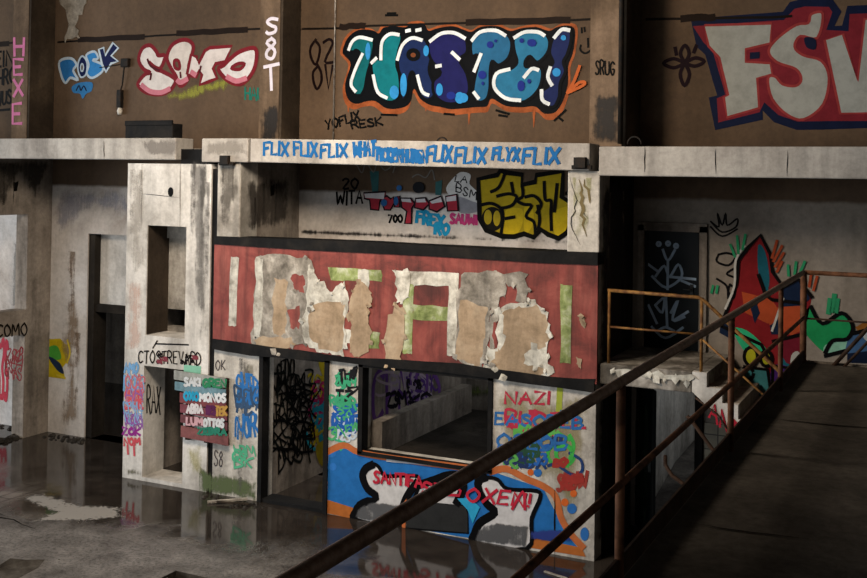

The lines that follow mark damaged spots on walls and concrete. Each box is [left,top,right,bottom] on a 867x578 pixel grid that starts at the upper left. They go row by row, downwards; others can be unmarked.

flaking render [60,0,87,43]
peeling [250,254,410,371]
peeling [452,270,555,381]